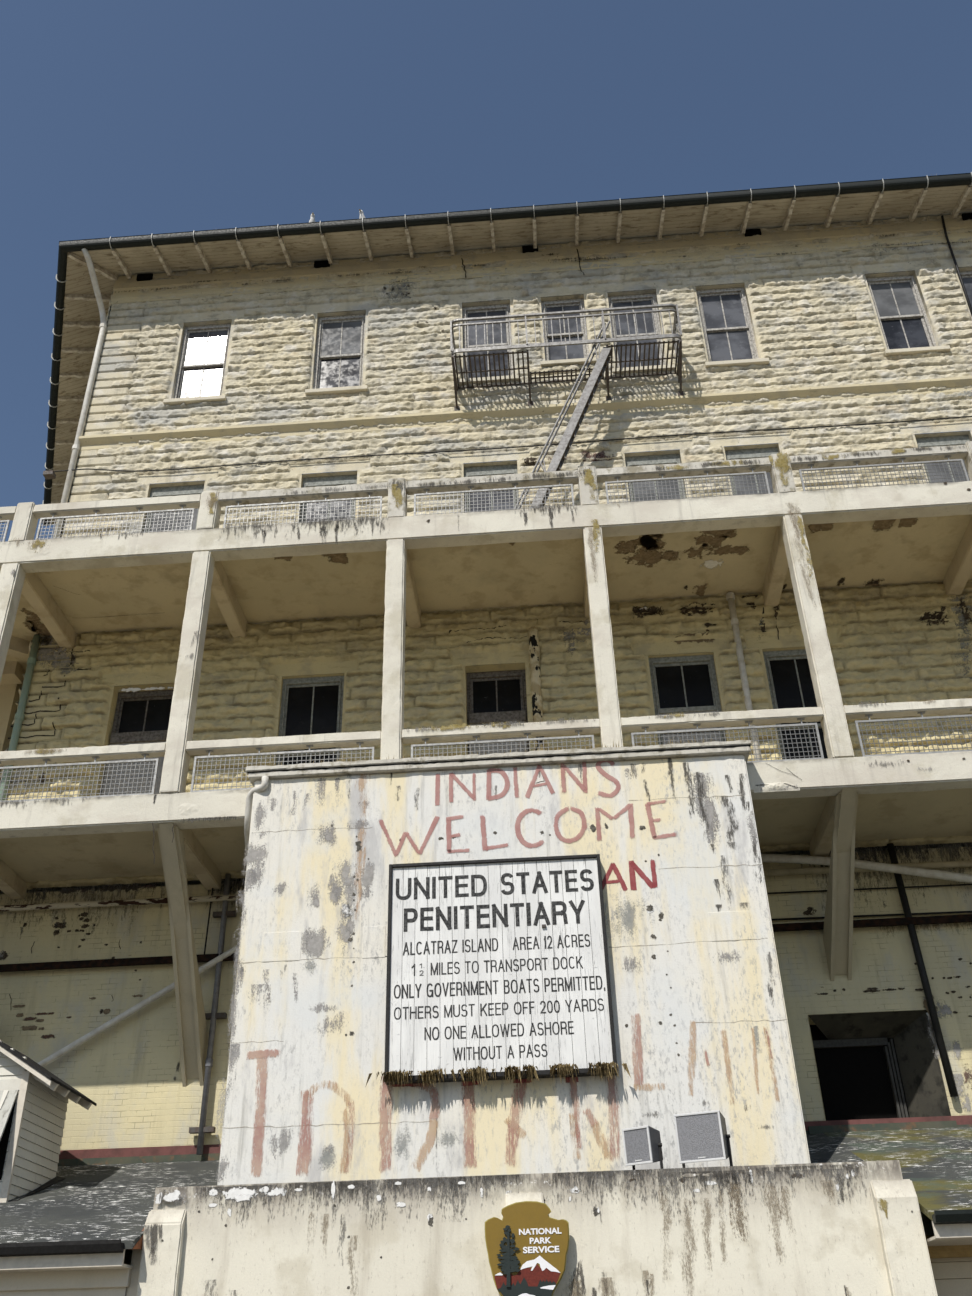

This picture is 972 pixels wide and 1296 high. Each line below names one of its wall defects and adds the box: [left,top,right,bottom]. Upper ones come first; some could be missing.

peeling [872,518,918,532]
peeling [615,529,750,644]
flaking render [918,597,972,626]
leakage [291,775,368,815]
leakage [854,842,972,909]
spalling [54,912,95,948]
leakage [206,798,298,1133]
leakage [314,1004,342,1037]
peeling [863,958,972,1112]
peeling [155,1159,302,1227]
leakage [549,1164,863,1283]